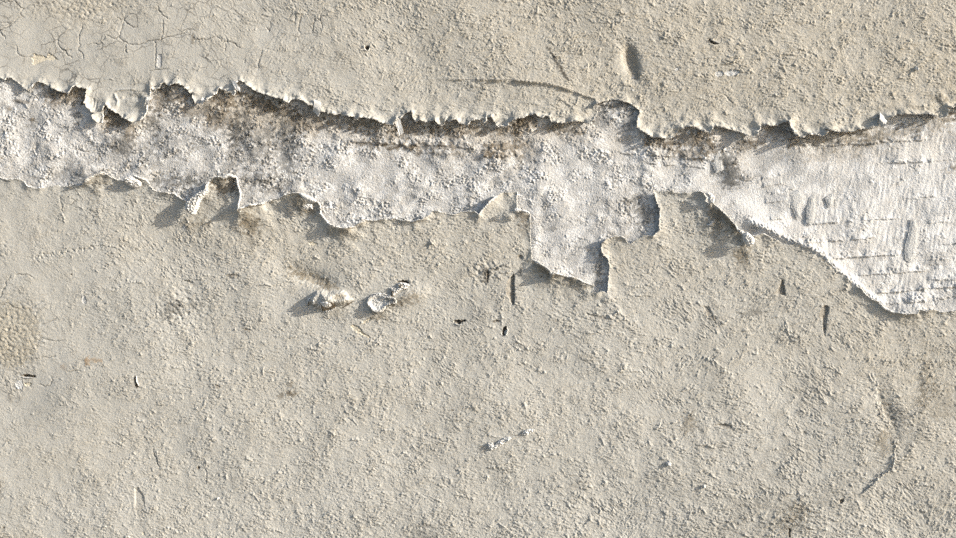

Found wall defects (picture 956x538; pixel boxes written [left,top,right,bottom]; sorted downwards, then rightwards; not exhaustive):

peeling [0,78,956,315]
leakage [722,162,743,189]